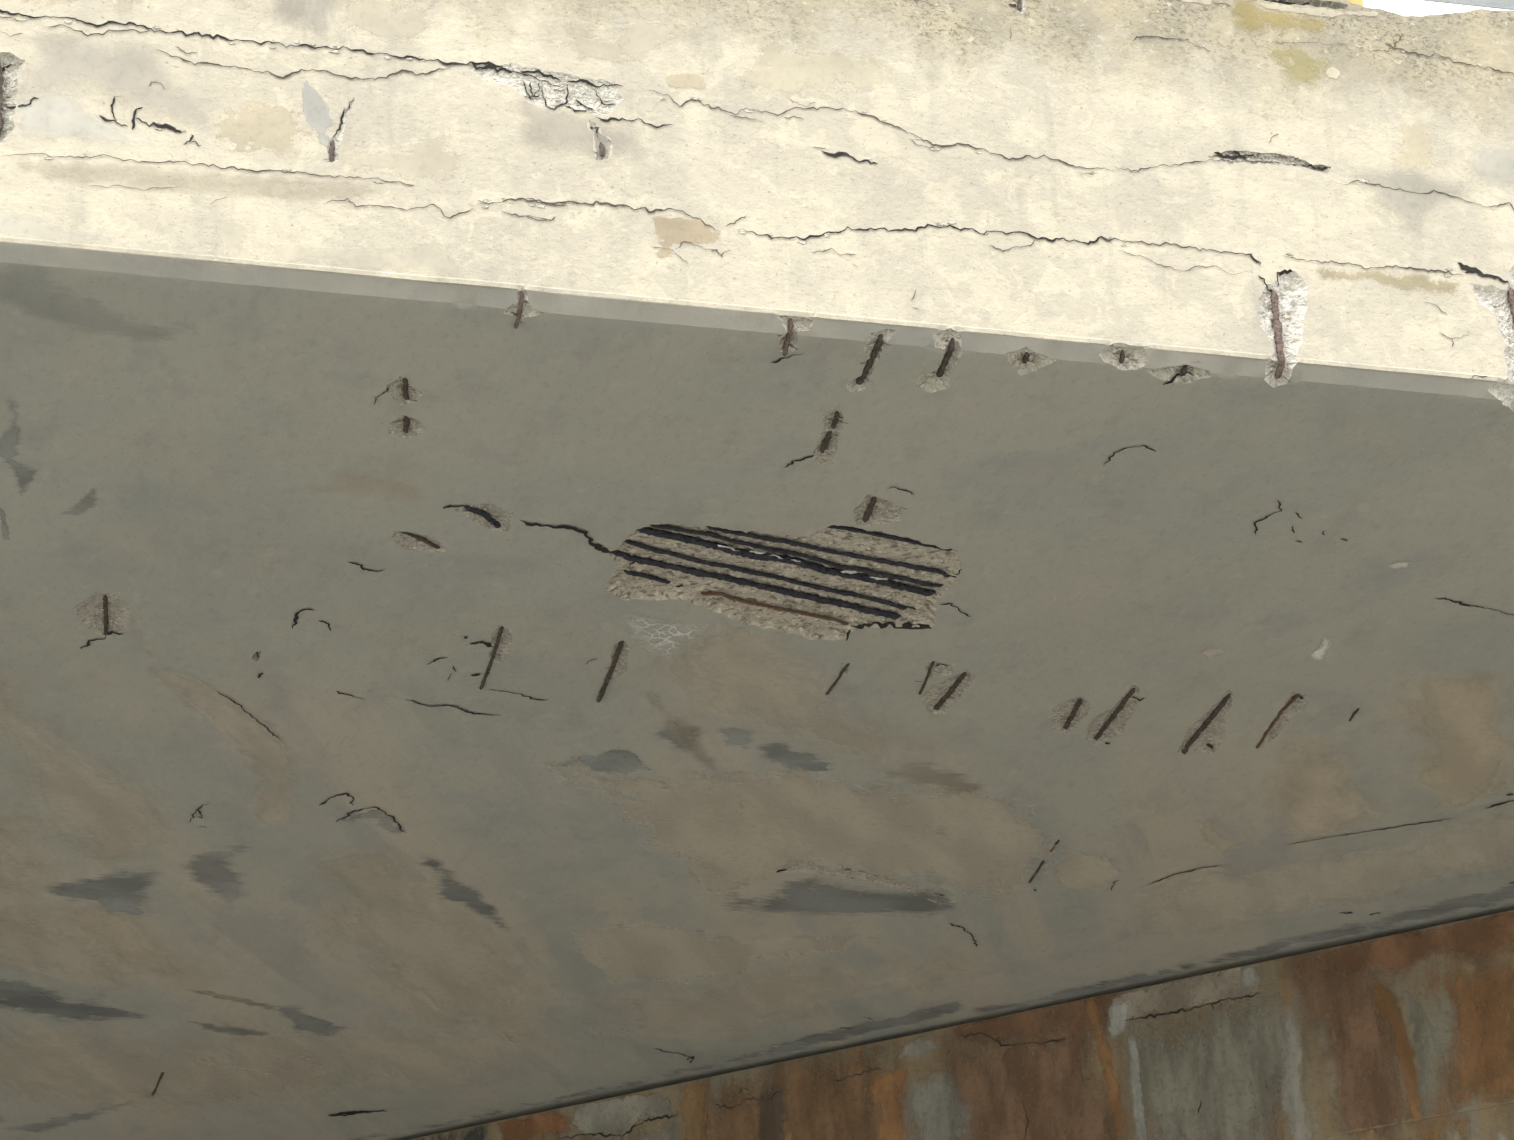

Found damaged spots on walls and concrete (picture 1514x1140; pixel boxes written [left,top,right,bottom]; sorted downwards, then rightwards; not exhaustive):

spalling [0,52,38,143]
crack [0,9,1514,379]
spalling [1250,254,1309,388]
crack [520,520,613,553]
spalling [605,494,969,641]
crack [1435,598,1510,615]
damp [51,872,153,915]
damp [424,861,503,927]
damp [189,990,343,1036]
rust [1292,912,1514,1122]
rust [703,1050,906,1140]
rust [940,993,1126,1140]